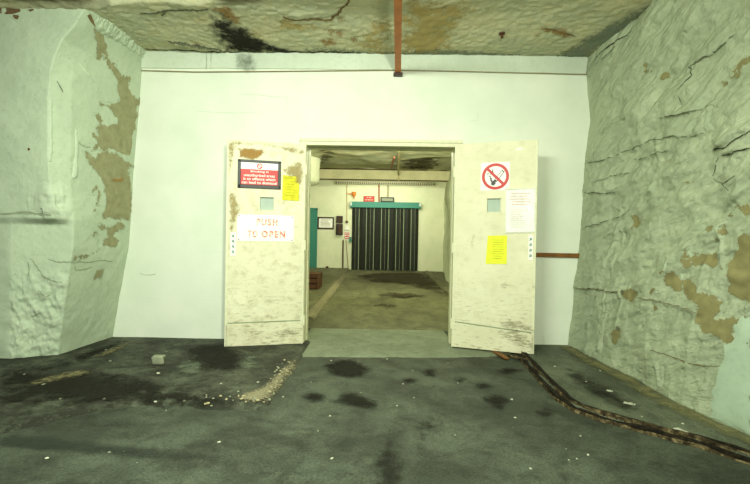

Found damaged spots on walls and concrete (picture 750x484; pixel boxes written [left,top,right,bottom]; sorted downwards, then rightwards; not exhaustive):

crack [283,0,350,22]
crack [661,34,734,118]
peeling [73,28,140,264]
crack [584,133,702,194]
crack [712,131,750,189]
peeling [620,287,637,305]
peeling [649,202,750,344]
damp [32,370,88,384]
damp [179,345,239,373]
peeling [611,326,621,346]